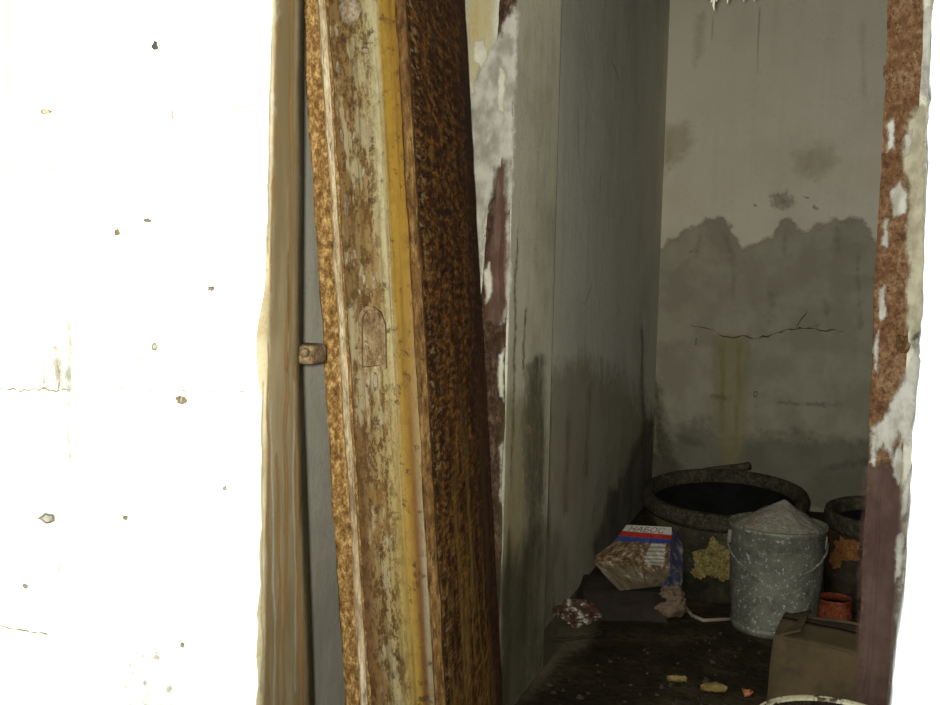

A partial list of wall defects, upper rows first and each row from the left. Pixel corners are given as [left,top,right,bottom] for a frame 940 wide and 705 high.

peeling [470,3,518,322]
leakage [496,193,877,705]
crack [691,312,844,339]
peeling [870,0,938,582]